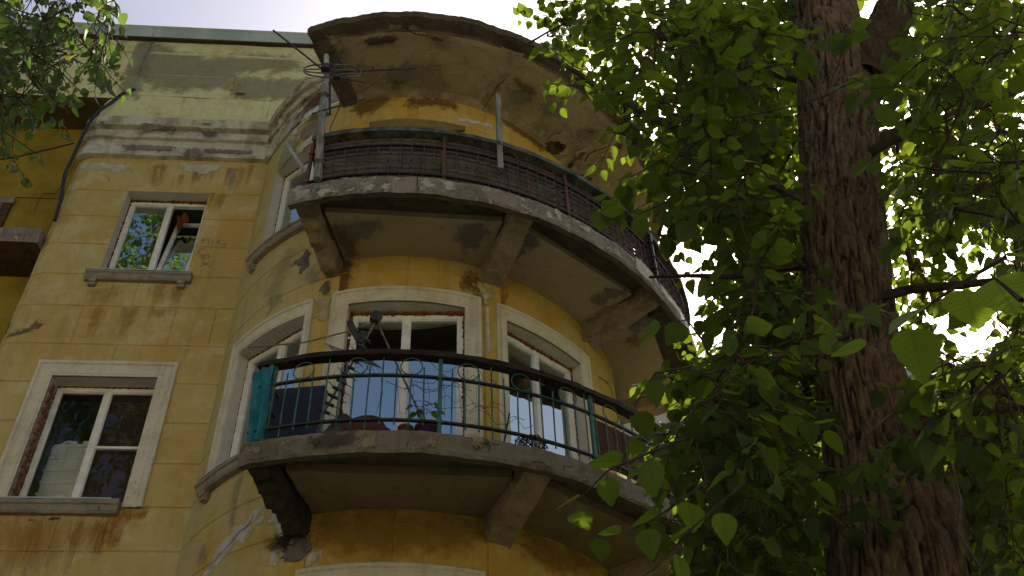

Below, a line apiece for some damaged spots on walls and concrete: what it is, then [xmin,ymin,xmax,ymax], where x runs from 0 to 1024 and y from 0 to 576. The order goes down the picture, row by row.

leakage [122,41,303,101]
leakage [351,98,391,118]
leakage [404,97,456,110]
leakage [502,120,547,151]
spalling [543,130,625,181]
flaking render [291,249,311,274]